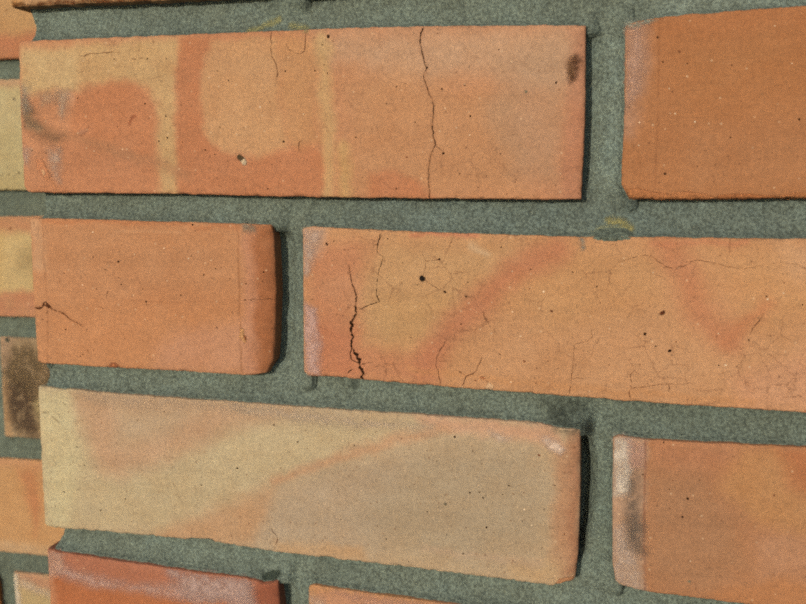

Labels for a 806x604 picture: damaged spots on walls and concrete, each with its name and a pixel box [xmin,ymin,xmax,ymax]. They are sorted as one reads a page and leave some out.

crack [419,27,440,197]
crack [36,301,77,323]
crack [348,235,383,379]
crack [435,339,483,385]
efflorescence [614,439,643,495]